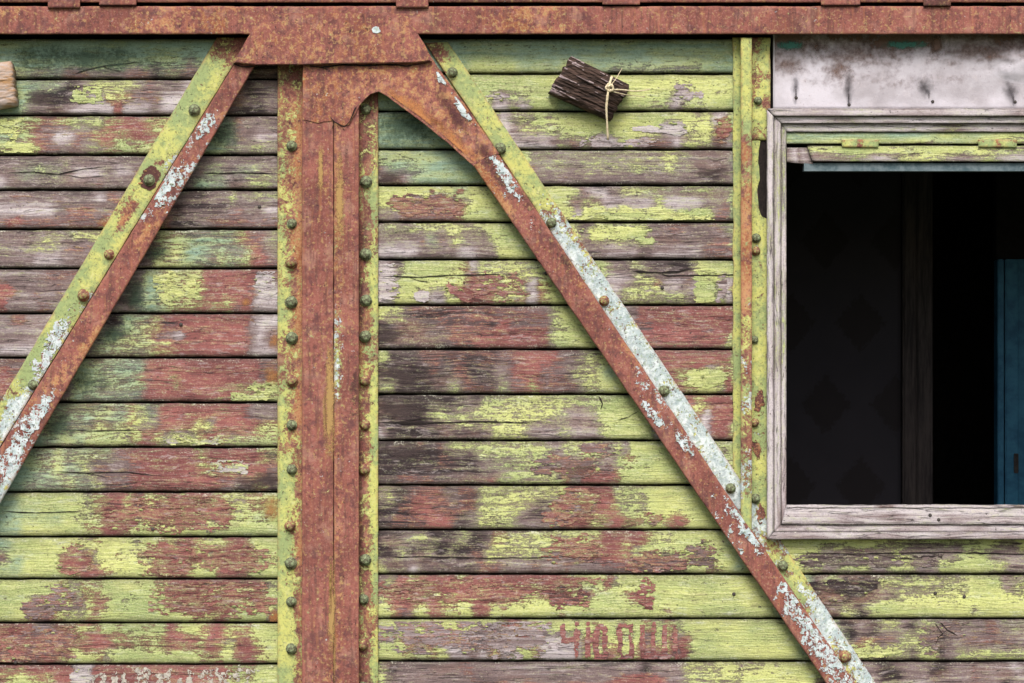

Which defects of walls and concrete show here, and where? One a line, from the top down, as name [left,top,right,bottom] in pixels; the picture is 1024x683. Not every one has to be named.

corrosion [388,93,489,159]
corrosion [335,156,344,230]
peeling [562,211,715,245]
peeling [0,388,55,482]
corrosion [322,348,335,453]
corrosion [752,440,761,461]
corrosion [754,388,765,416]
peeling [103,495,278,618]
peeling [625,495,766,610]
corrosion [756,503,766,524]
peeling [378,577,607,659]
peeling [772,577,849,683]